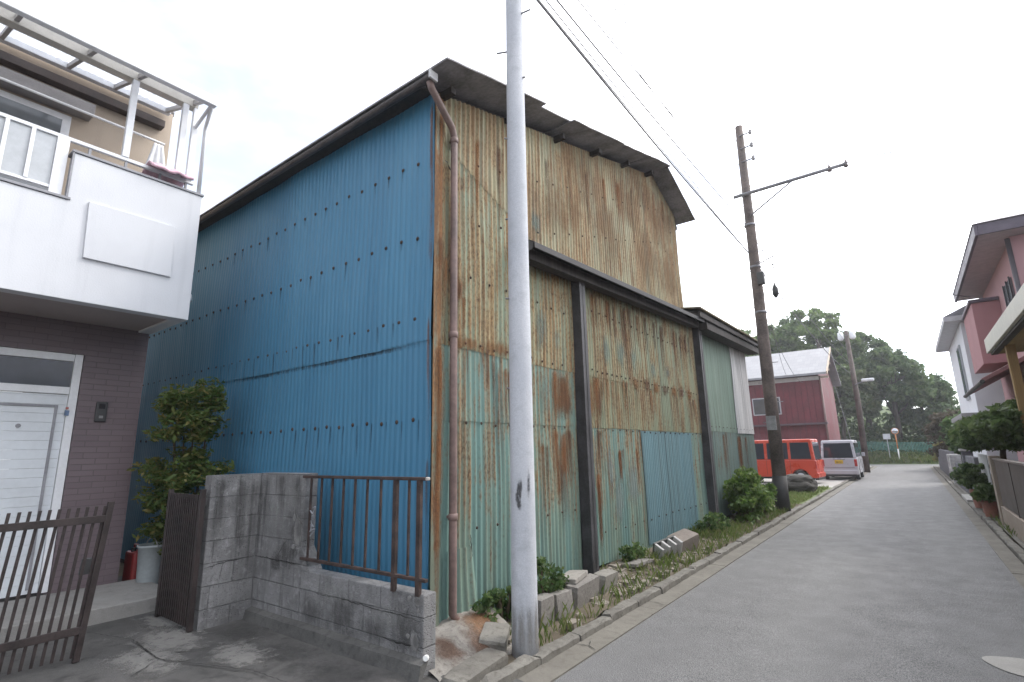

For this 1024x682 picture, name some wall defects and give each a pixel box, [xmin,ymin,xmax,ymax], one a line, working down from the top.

rust [590,294,691,363]
rust [458,338,509,433]
rust [541,372,573,509]
rust [597,431,623,538]
rust [590,378,696,415]